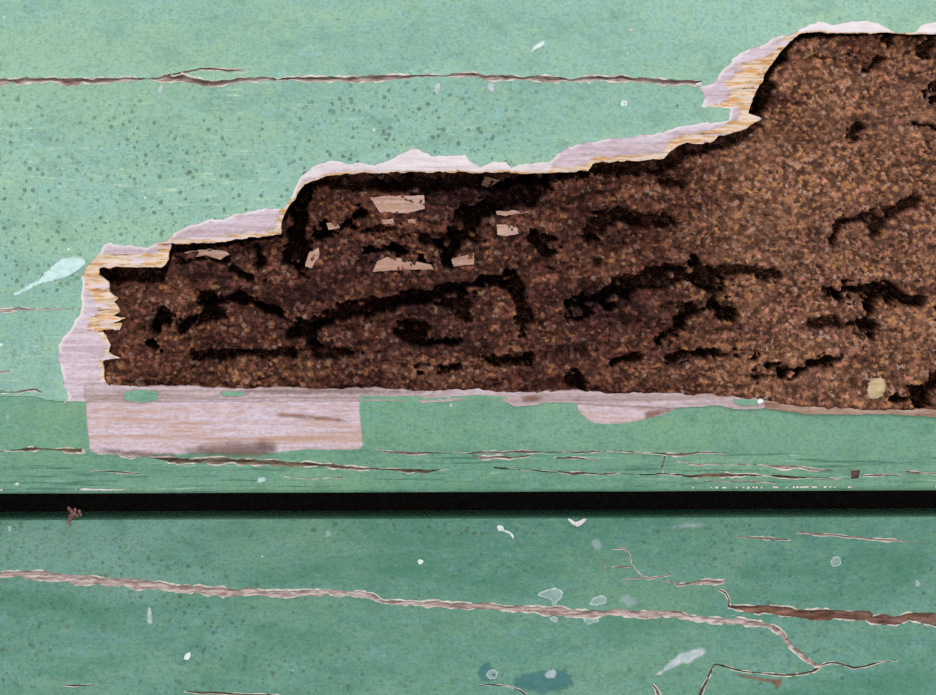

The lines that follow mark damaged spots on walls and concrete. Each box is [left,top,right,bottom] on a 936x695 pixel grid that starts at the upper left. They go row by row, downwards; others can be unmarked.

crack [0,67,702,88]
peeling [58,20,936,458]
crack [0,446,936,484]
crack [0,548,936,695]